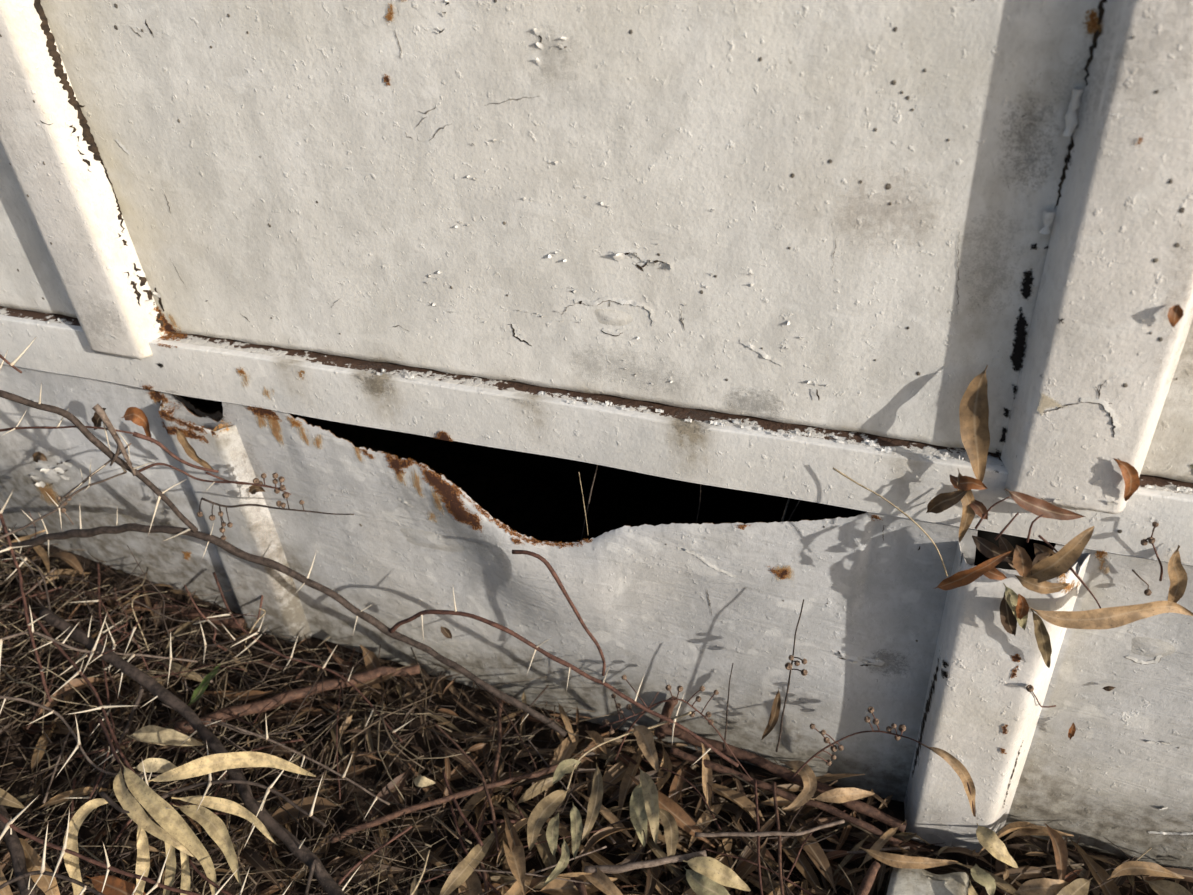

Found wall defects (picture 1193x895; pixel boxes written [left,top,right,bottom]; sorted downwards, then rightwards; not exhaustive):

crack [1082,0,1107,86]
crack [34,0,131,232]
crack [1055,131,1074,207]
rust [154,306,188,348]
rust [142,385,232,444]
peeling [171,394,225,421]
rust [245,387,322,448]
peeling [567,397,630,411]
peeling [710,420,811,438]
peeling [864,439,896,453]
rust [355,447,593,549]
crack [912,659,939,778]